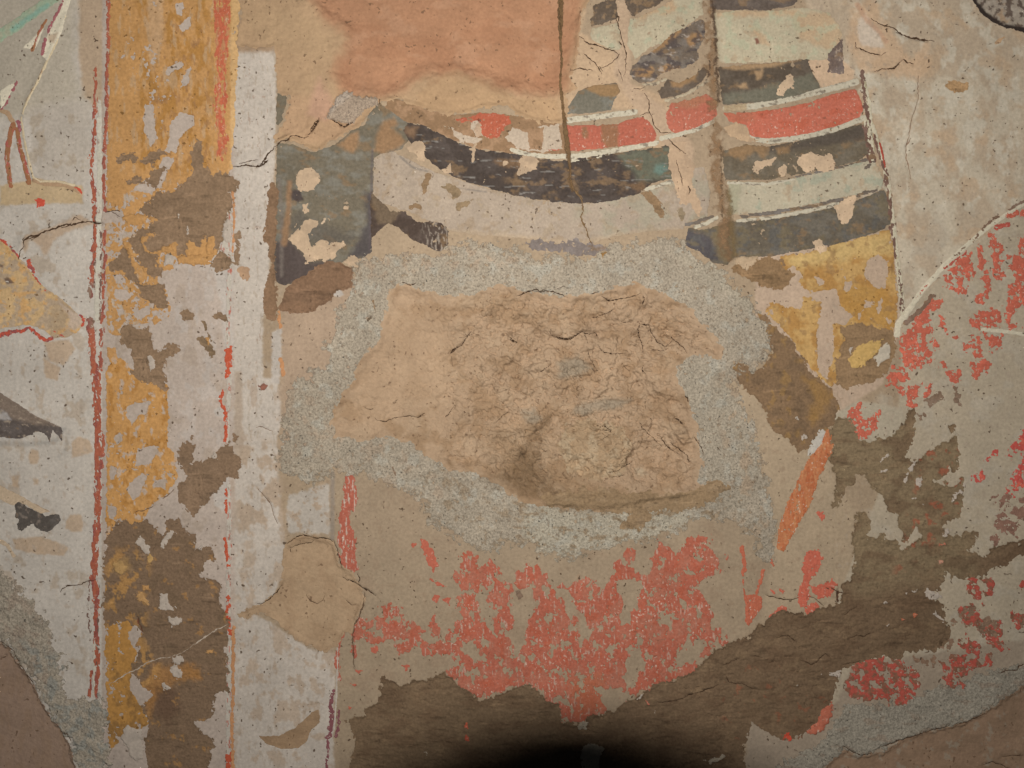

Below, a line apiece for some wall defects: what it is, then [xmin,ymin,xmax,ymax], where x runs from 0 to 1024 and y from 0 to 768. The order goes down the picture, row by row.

crack [18,210,120,260]
peeling [108,138,250,309]
crack [233,119,353,168]
crack [571,184,593,246]
spalling [329,281,731,532]
peeling [101,432,366,768]
peeling [344,313,1024,768]
spalling [0,642,76,768]